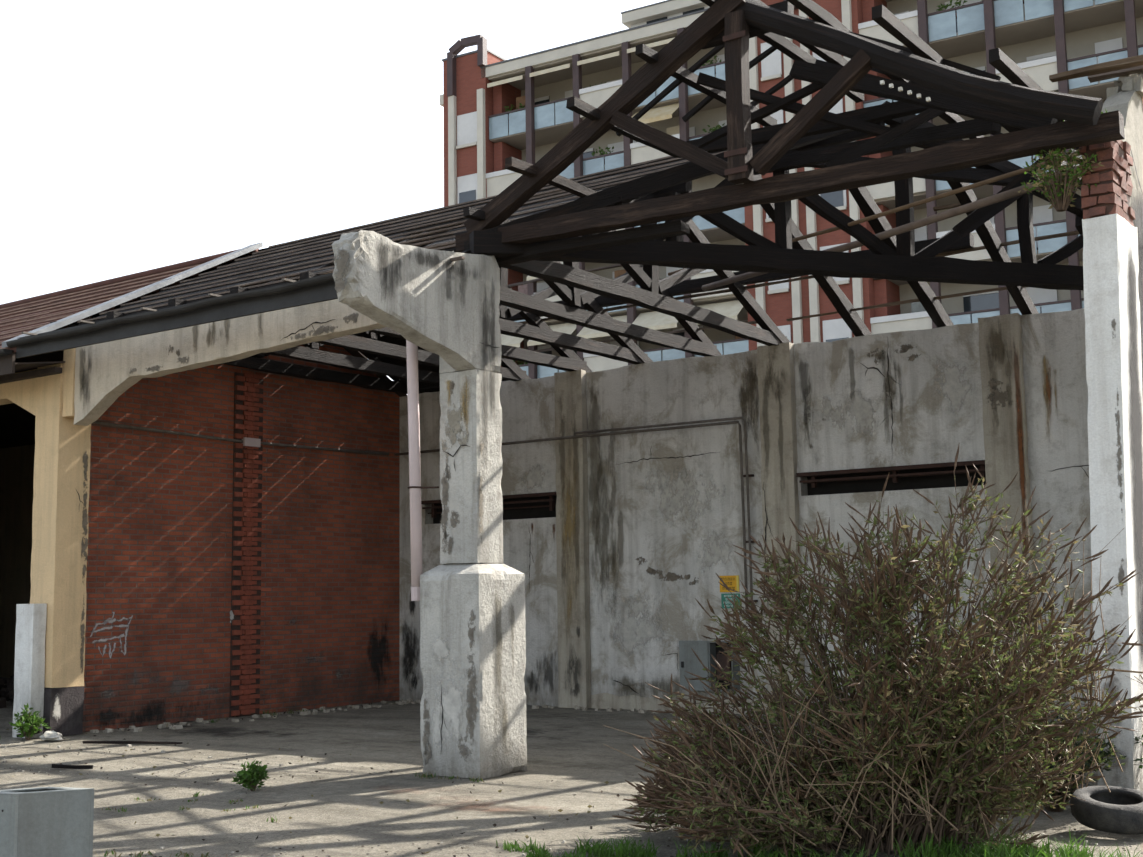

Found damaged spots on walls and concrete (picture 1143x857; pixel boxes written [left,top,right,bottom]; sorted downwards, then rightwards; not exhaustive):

water stain [379,245,401,290]
crack [280,319,335,341]
water stain [1129,195,1143,657]
rust [1014,354,1026,559]
water stain [368,623,390,685]
water stain [527,656,553,692]
water stain [569,652,579,696]